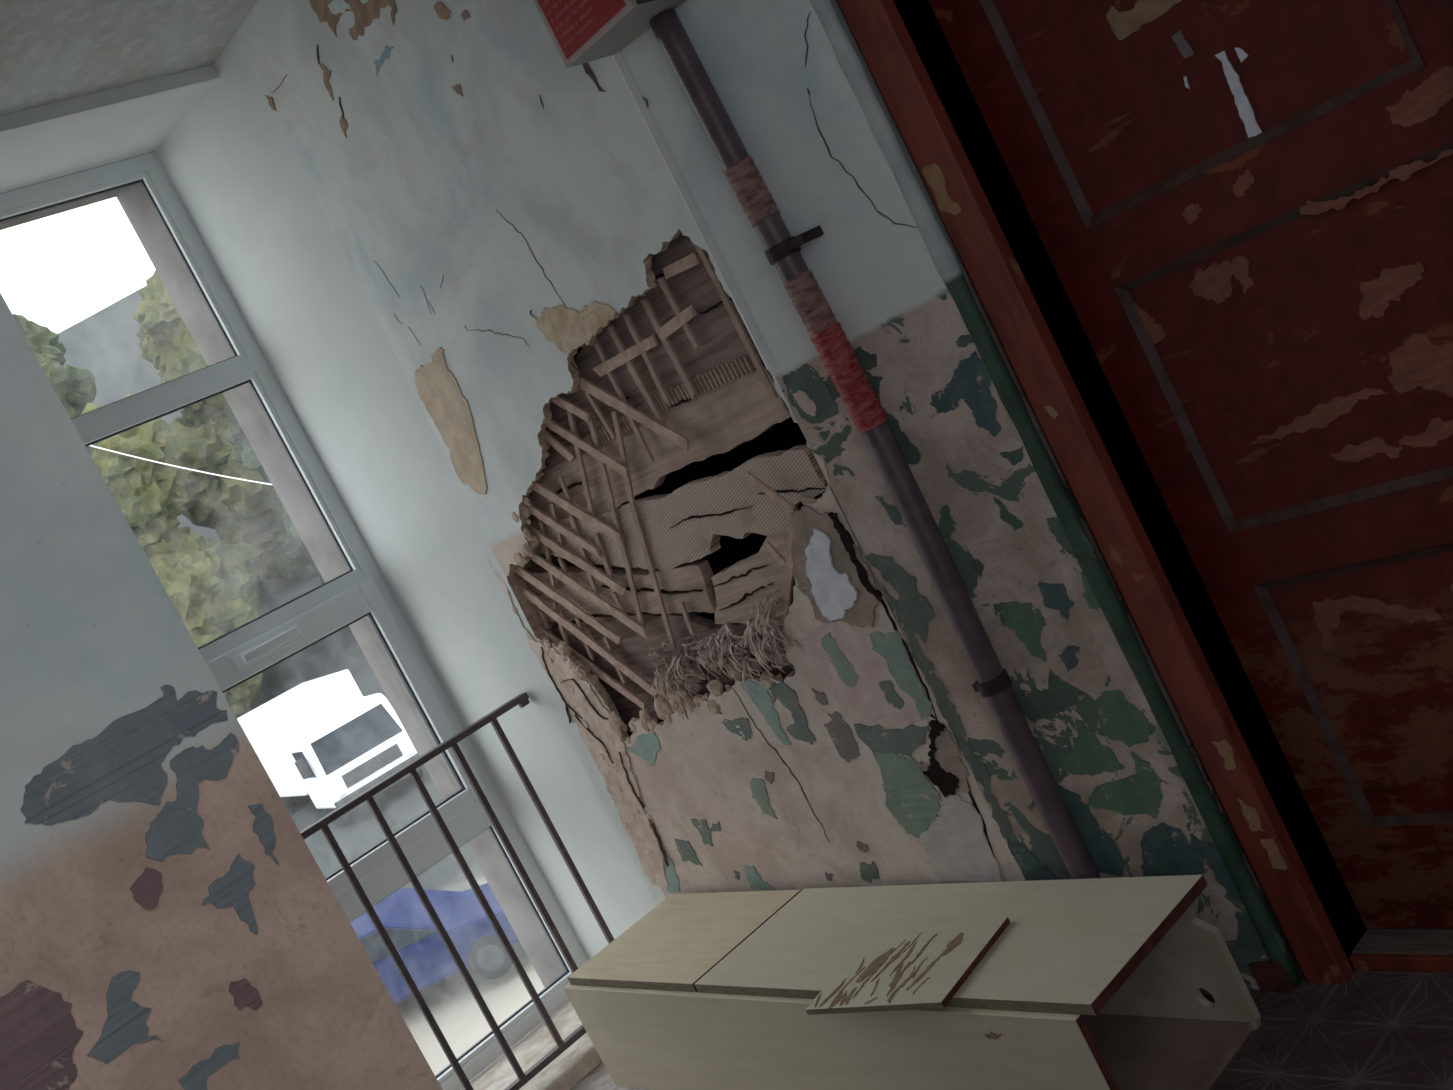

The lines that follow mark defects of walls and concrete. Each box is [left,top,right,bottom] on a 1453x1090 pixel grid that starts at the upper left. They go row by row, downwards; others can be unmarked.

spalling [309,0,398,40]
crack [804,13,917,228]
crack [375,210,566,346]
spalling [415,347,488,495]
spalling [507,233,1059,893]
crack [880,597,938,721]
peeling [20,685,239,910]
peeling [201,804,279,934]
crack [685,688,829,841]
crack [967,780,995,857]
peeling [0,970,161,1090]
peeling [228,978,263,1010]